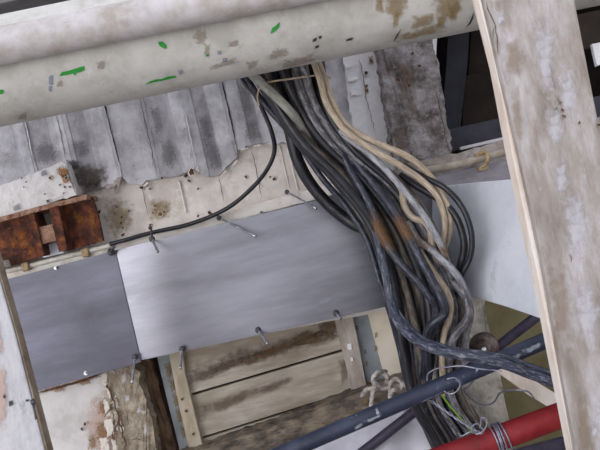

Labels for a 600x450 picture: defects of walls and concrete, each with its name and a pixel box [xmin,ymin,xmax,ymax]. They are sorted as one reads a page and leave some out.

rust [42,167,69,183]
leakage [68,161,106,191]
peeling [99,370,126,450]